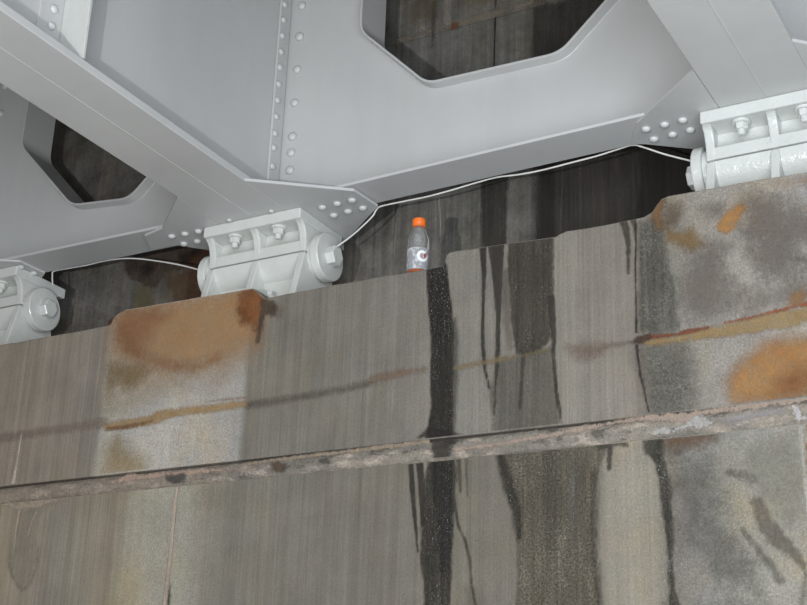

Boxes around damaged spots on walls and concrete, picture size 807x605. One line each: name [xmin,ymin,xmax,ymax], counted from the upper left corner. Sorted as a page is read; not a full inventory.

rust [652,199,700,247]
rust [718,204,745,233]
rust [104,402,245,430]
rust [108,250,261,365]
leakage [409,263,476,605]
leakage [479,144,695,430]
rust [633,292,807,345]
rust [732,339,807,402]
crack [163,487,178,605]
leakage [497,443,628,605]